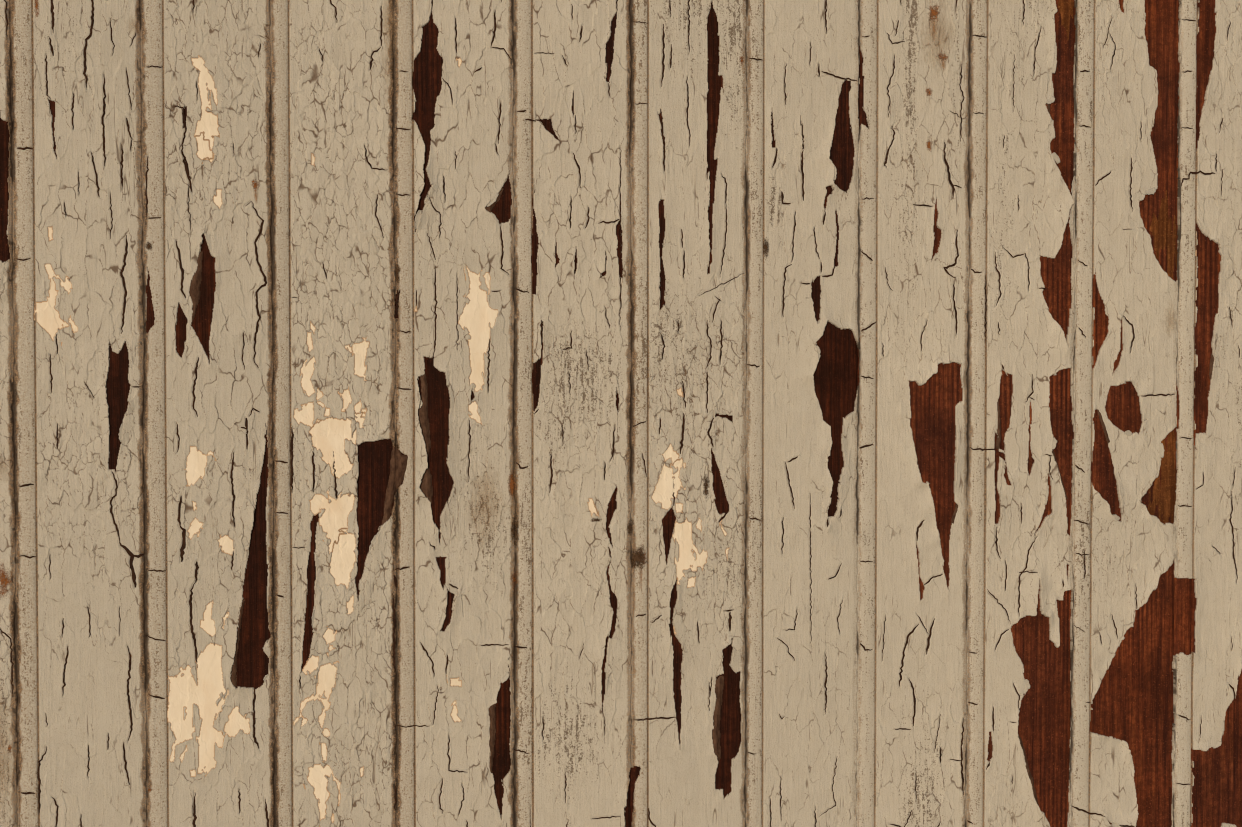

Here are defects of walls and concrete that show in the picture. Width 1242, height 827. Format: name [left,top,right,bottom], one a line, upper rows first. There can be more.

crack [45,0,198,334]
crack [242,201,297,370]
crack [364,145,490,391]
peeling [417,357,455,631]
crack [608,0,691,171]
peeling [811,276,860,524]
peeling [909,362,962,587]
crack [920,230,1046,402]
peeling [1139,0,1180,282]
crack [719,456,1020,827]
peeling [1011,564,1071,827]
peeling [1089,560,1196,827]